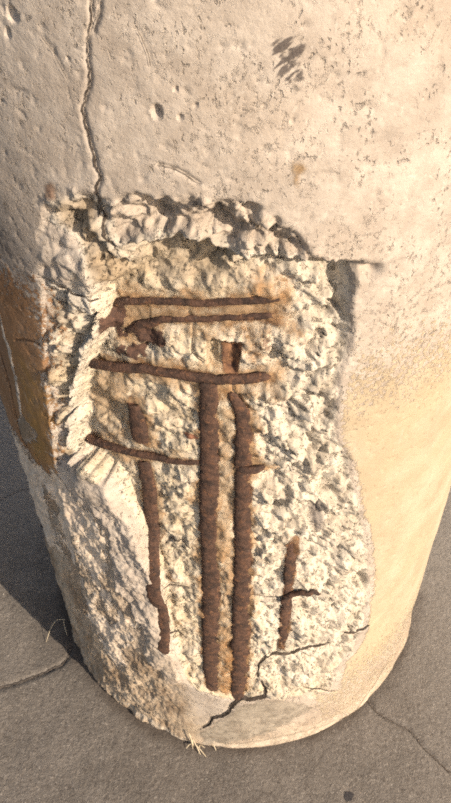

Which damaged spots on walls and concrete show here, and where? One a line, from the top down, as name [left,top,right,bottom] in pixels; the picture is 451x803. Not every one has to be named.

crack [81,0,116,261]
water stain [0,320,37,442]
spalling [10,181,372,704]
corrosion [93,266,303,691]
crack [202,625,370,728]